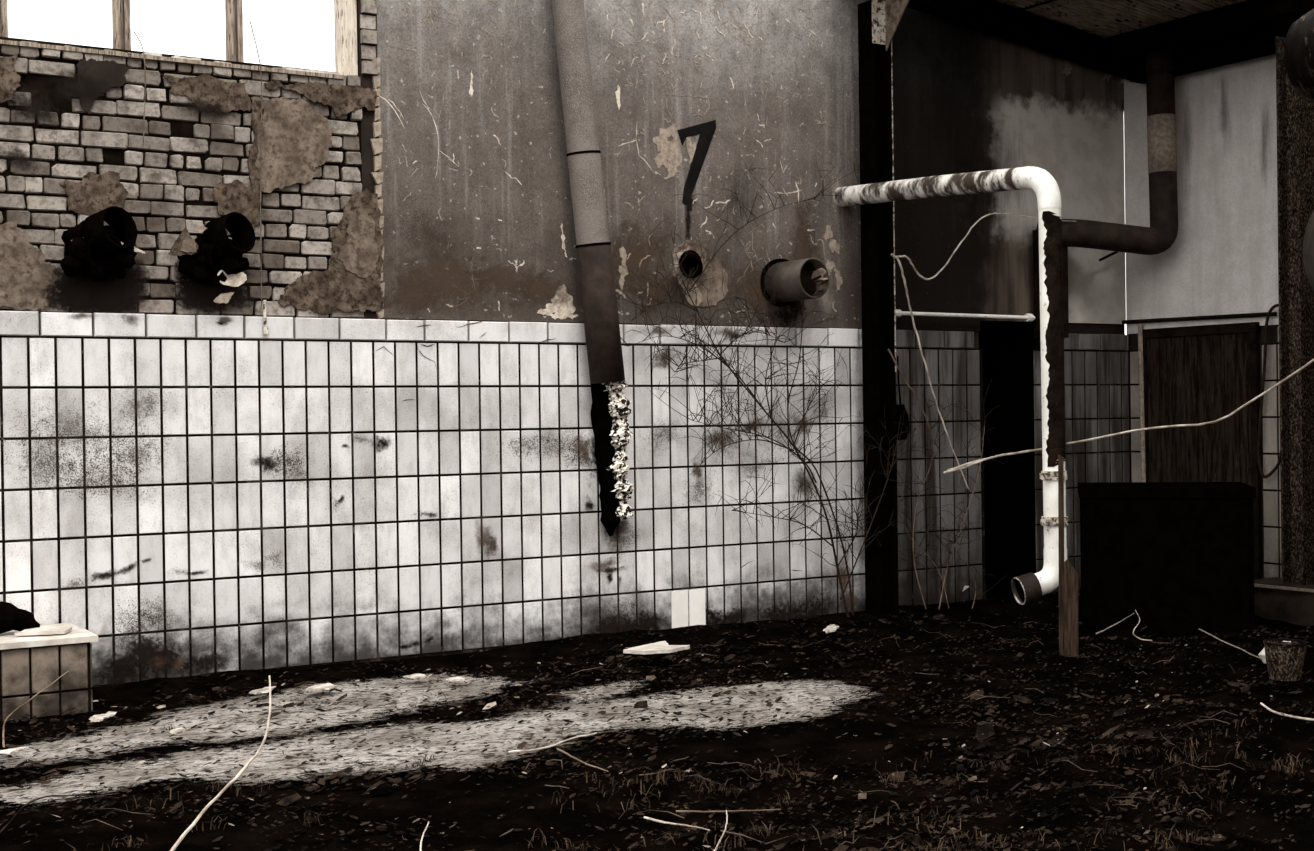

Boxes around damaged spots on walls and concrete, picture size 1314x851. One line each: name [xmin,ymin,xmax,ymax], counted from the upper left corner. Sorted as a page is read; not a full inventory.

peeling [431,43,492,97]
peeling [605,0,832,157]
spalling [370,58,385,319]
peeling [617,118,711,182]
peeling [537,285,578,319]
peeling [616,233,653,305]
flaking render [674,199,735,306]
peeling [807,225,843,312]
leakage [7,386,185,500]
leakage [510,433,593,467]